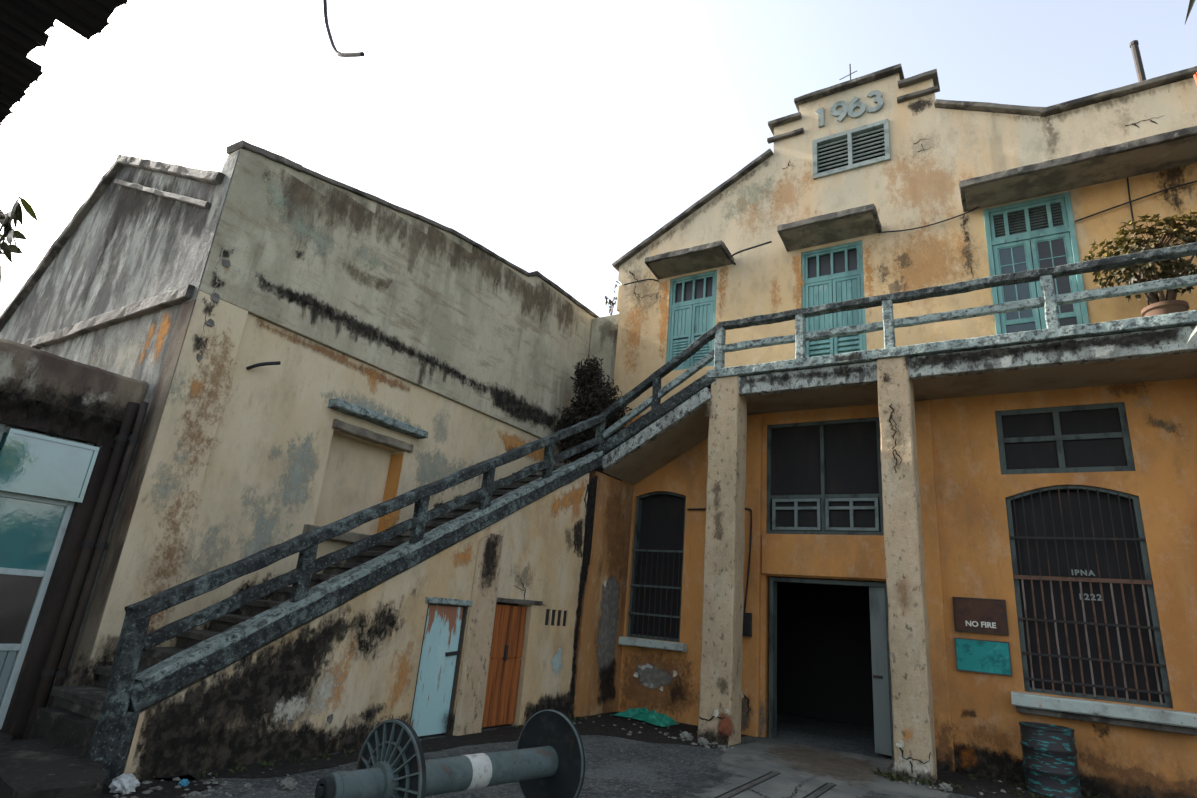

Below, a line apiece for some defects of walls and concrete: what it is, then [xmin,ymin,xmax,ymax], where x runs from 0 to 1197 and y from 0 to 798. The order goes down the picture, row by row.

leakage [82,174,200,300]
leakage [266,173,573,329]
corrosion [139,314,171,364]
mould [259,274,558,430]
crack [889,404,902,473]
spalling [596,574,619,704]
mould [135,603,410,780]
mould [445,713,455,736]
mould [524,691,575,725]
spalling [633,664,678,691]
leakage [936,724,1025,783]
leakage [1079,754,1197,798]